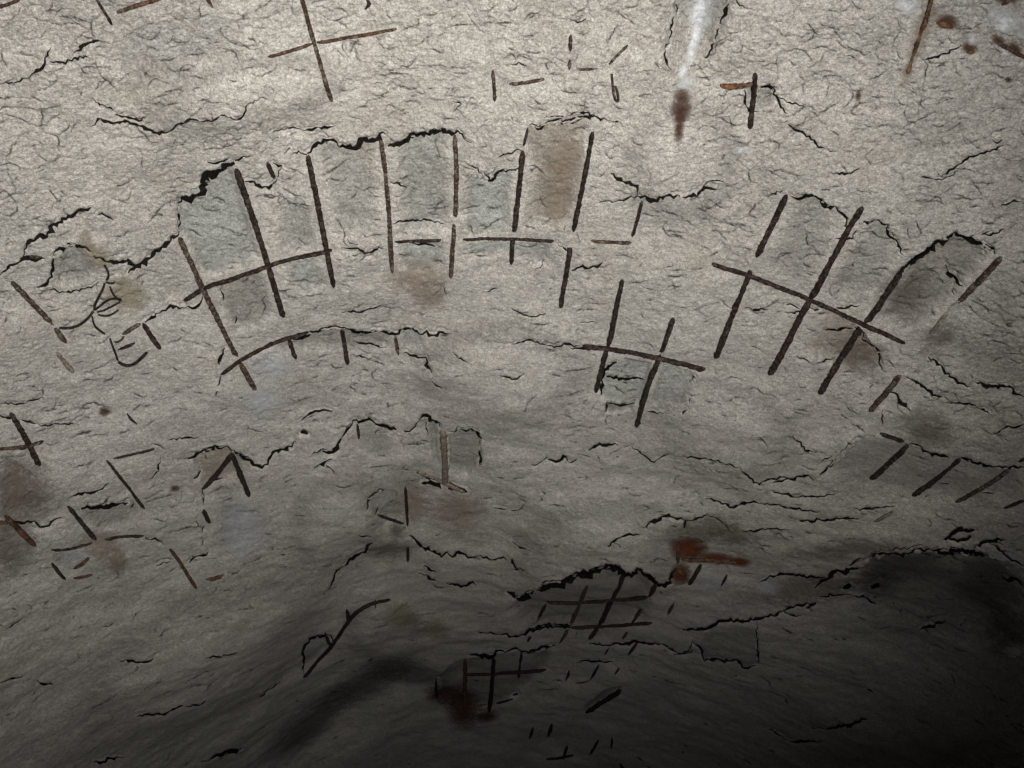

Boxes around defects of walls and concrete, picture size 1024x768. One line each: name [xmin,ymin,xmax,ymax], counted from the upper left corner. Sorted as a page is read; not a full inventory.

water stain [679,0,720,78]
rust [994,36,1020,51]
crack [0,98,522,294]
spalling [374,128,554,279]
spalling [572,132,595,232]
spalling [177,155,399,390]
spalling [559,247,572,308]
spalling [583,194,1008,428]
spalling [201,453,251,497]
crack [914,444,1024,494]
rust [671,538,749,583]
spalling [434,564,658,717]